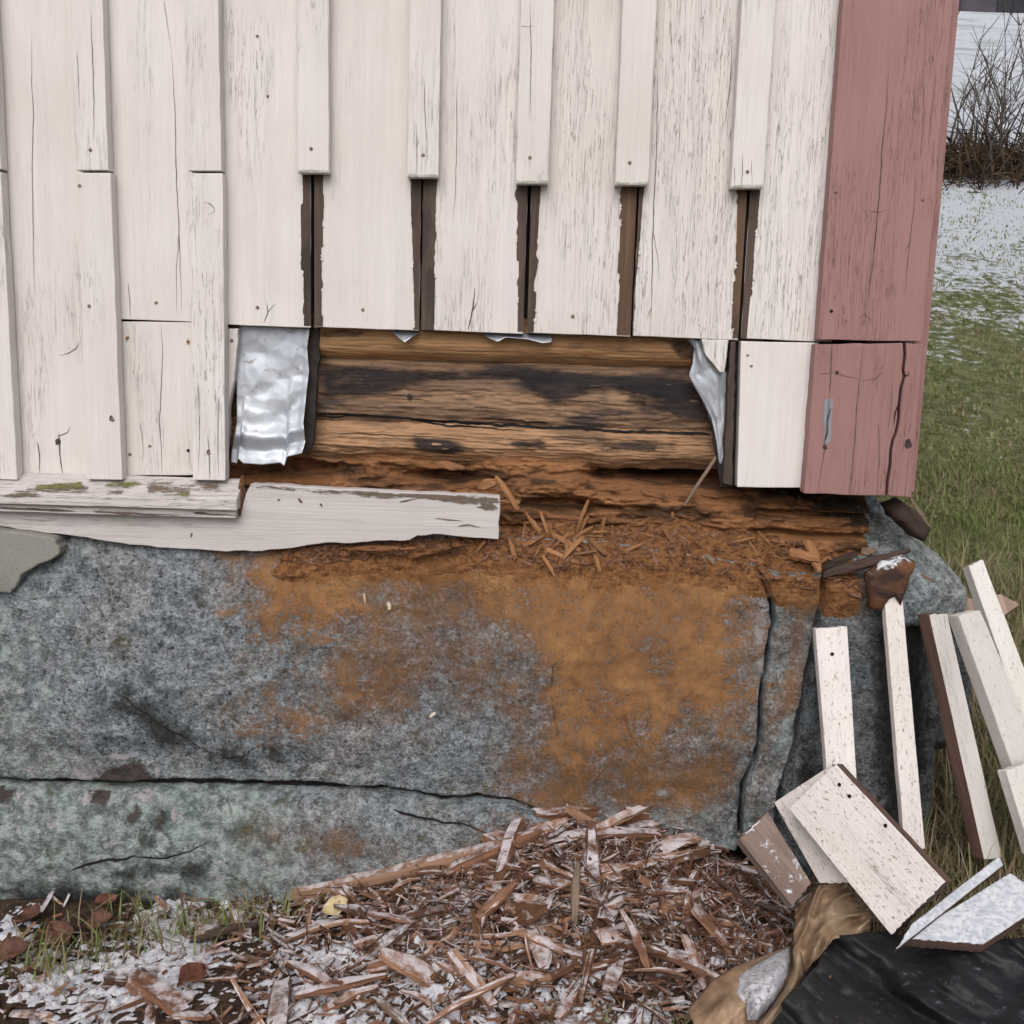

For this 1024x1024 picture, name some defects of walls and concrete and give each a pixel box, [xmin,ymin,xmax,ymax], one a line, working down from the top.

crack [821,70,909,493]
water stain [320,364,708,419]
water stain [414,438,466,454]
water stain [603,441,671,451]
peeling [259,486,499,510]
corrosion [208,548,820,821]
crack [739,597,772,799]
crack [33,692,535,833]
crack [67,840,211,872]